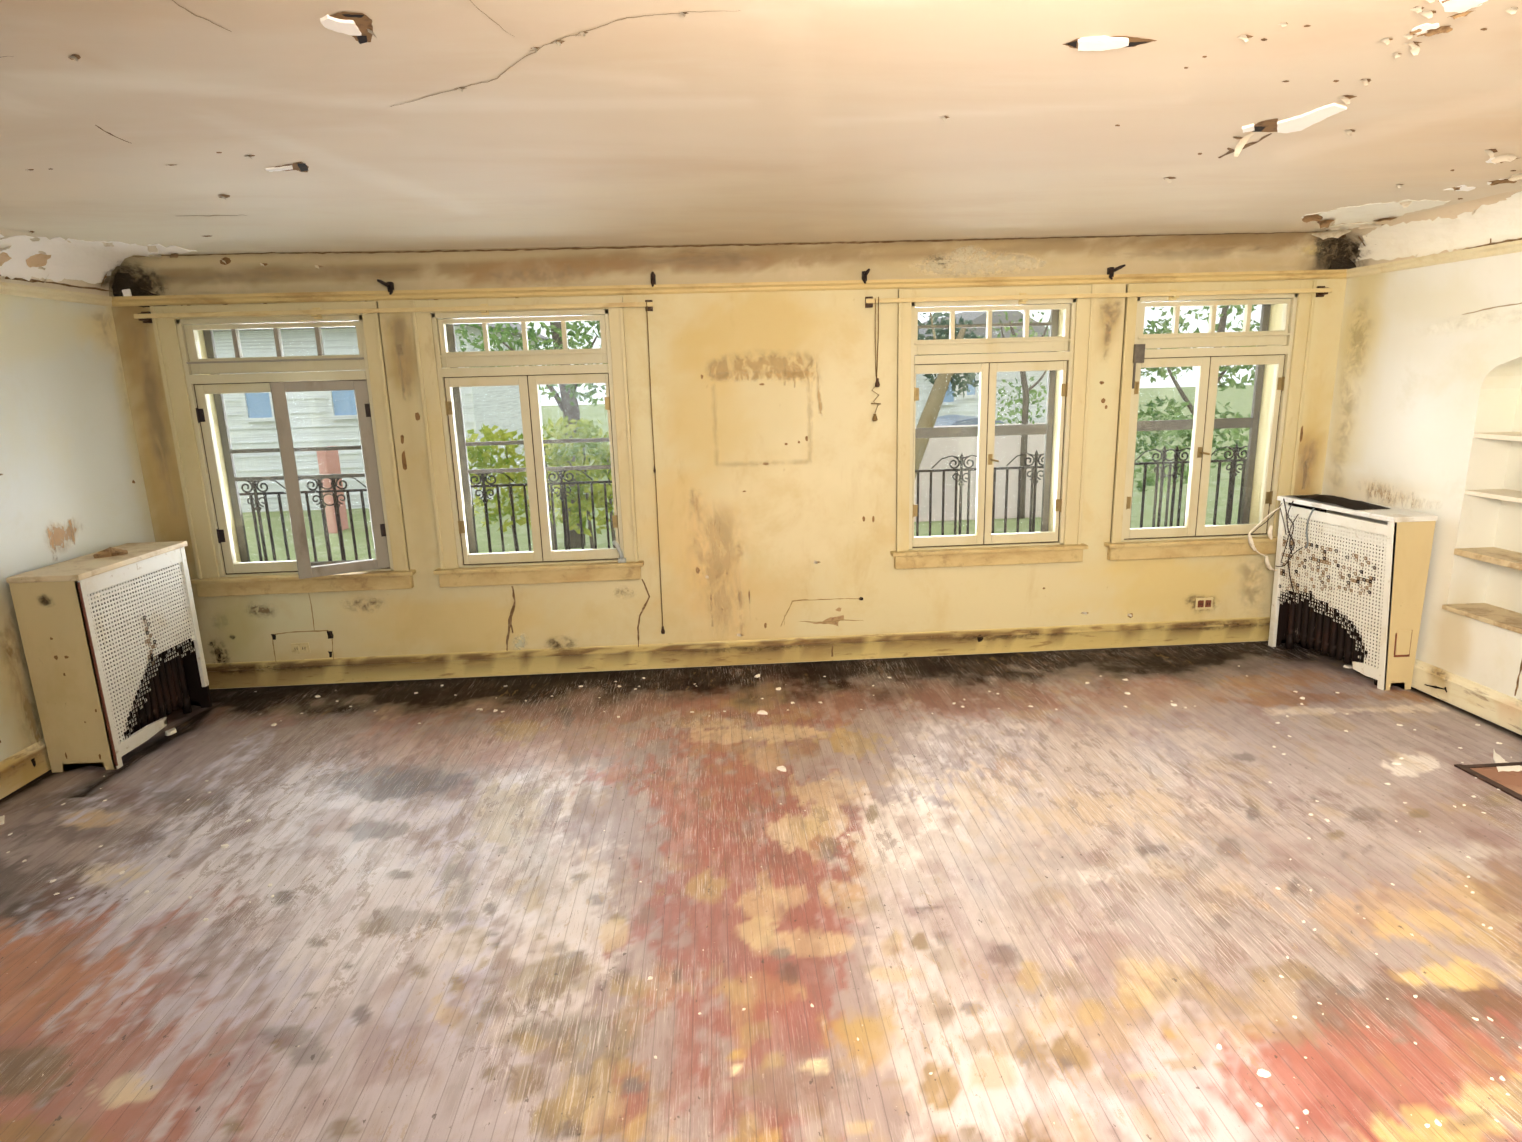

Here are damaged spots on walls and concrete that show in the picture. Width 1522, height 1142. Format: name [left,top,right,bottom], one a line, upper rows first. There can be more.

flaking render [320,12,376,44]
crack [391,0,741,107]
flaking render [1063,36,1157,51]
peeling [1379,0,1488,59]
flaking render [1234,79,1371,157]
peeling [1301,149,1522,270]
peeling [0,231,211,308]
crack [506,586,515,651]
crack [637,579,650,647]